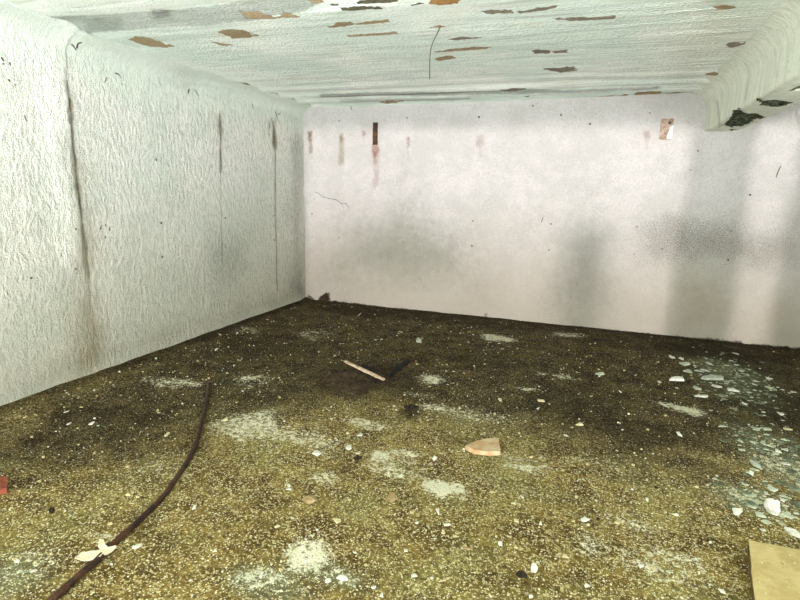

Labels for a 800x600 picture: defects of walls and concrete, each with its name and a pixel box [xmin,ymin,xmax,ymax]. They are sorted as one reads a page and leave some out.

peeling [240,11,300,19]
peeling [327,19,398,37]
peeling [128,36,174,48]
peeling [213,29,259,46]
peeling [435,36,490,61]
spalling [721,98,793,131]